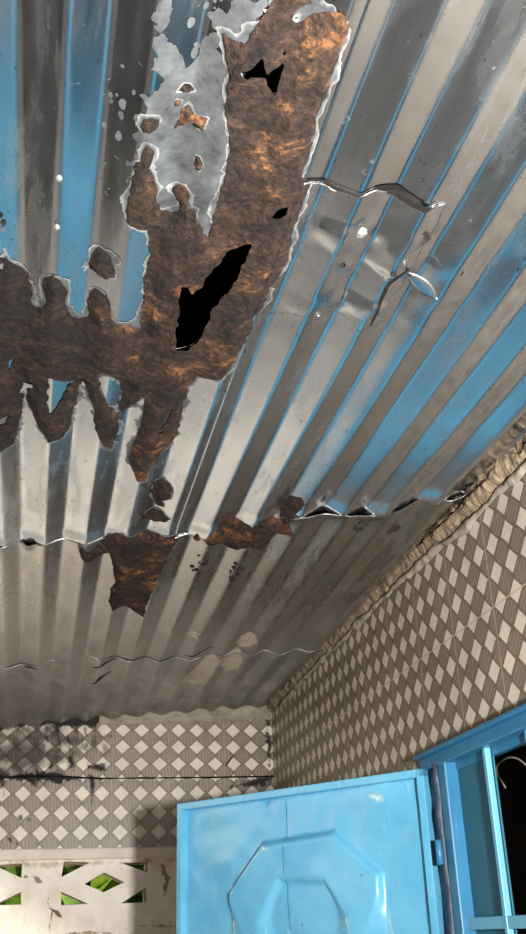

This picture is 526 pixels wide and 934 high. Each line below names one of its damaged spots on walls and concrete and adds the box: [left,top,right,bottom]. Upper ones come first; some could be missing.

rust [0,0,351,617]